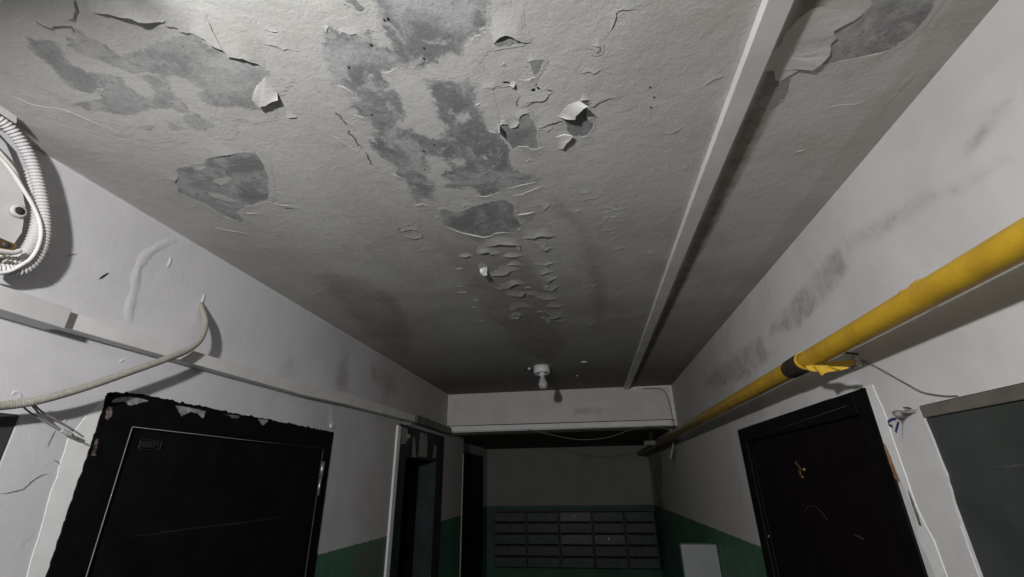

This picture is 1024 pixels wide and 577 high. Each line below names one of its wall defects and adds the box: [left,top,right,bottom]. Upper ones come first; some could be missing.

peeling [0,0,299,237]
peeling [297,0,596,243]
peeling [759,0,945,108]